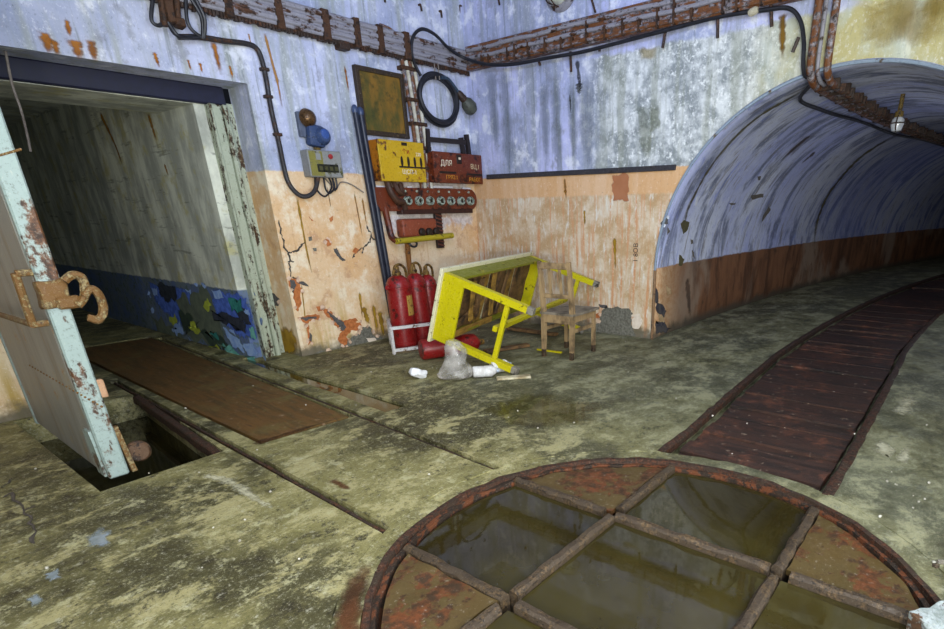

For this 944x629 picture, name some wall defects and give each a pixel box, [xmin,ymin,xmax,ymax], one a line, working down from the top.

corrosion [40,20,97,59]
leakage [569,61,582,109]
crack [278,221,306,293]
crack [352,226,375,258]
peeling [287,276,383,355]
spalling [596,304,643,337]
spalling [655,286,672,334]